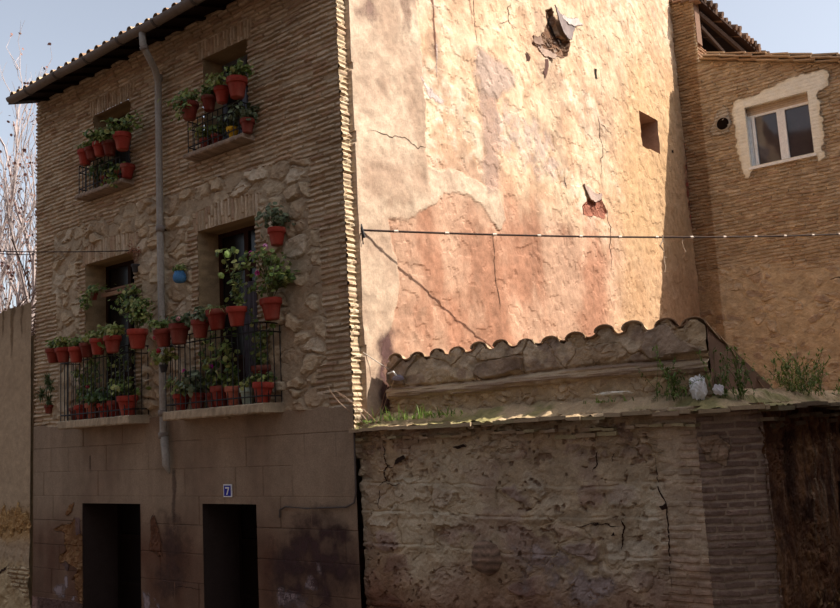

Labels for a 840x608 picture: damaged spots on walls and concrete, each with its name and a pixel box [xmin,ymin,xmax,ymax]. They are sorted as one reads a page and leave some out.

flaking render [532,5,583,78]
flaking render [582,183,607,219]
damp [273,516,356,607]